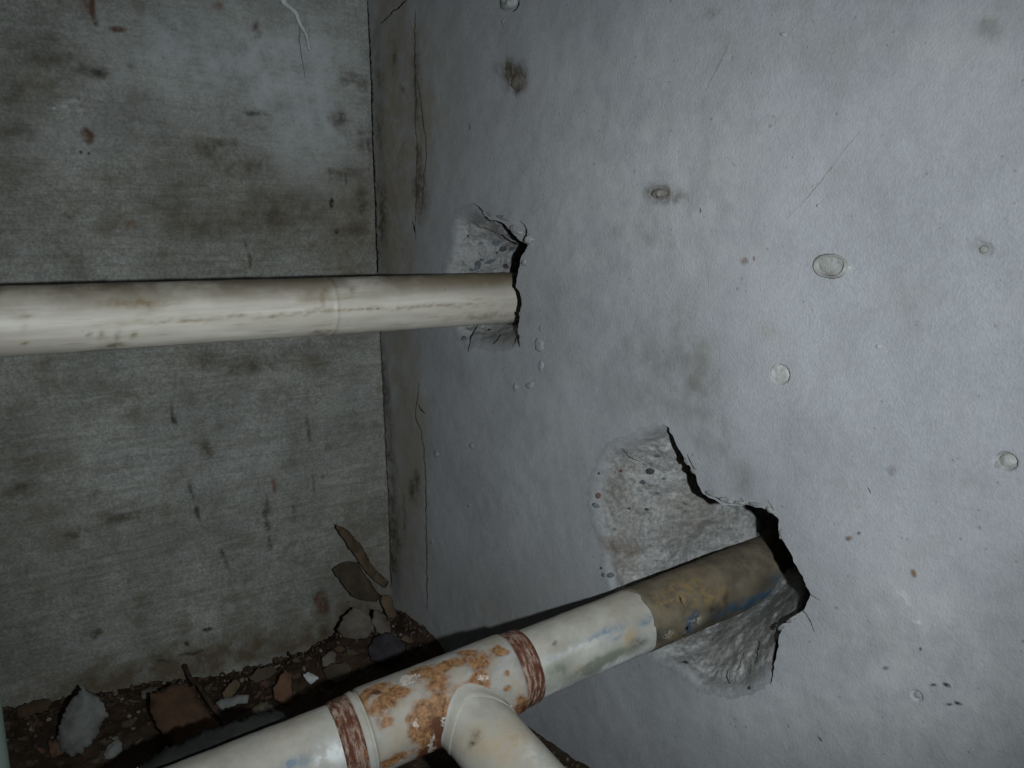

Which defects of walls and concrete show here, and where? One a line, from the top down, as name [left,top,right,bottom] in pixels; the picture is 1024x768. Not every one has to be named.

crack [367,0,427,273]
spalling [441,203,534,274]
spalling [451,312,521,353]
crack [415,385,428,610]
spalling [587,420,783,595]
spalling [644,564,811,699]